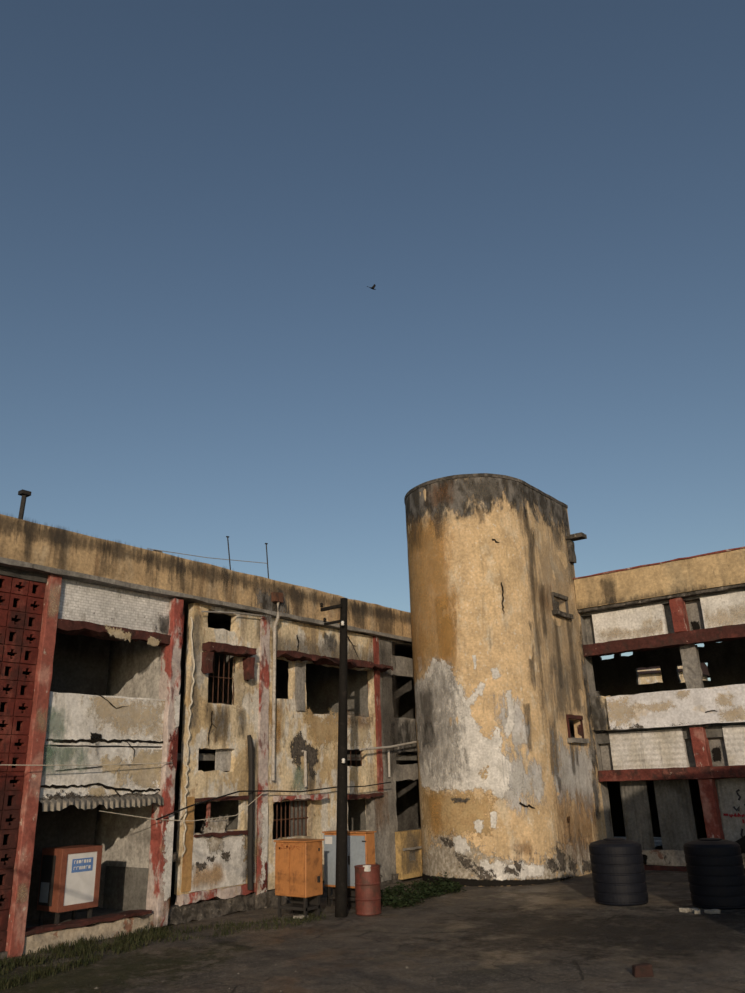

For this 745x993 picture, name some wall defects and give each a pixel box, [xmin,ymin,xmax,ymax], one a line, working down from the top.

damp [256,589,289,620]
damp [324,632,337,650]
peeling [42,695,180,800]
peeling [414,628,599,887]
peeling [607,690,690,730]
peeling [716,695,745,721]
peeling [162,814,174,901]
peeling [189,815,247,892]
peeling [259,802,268,893]